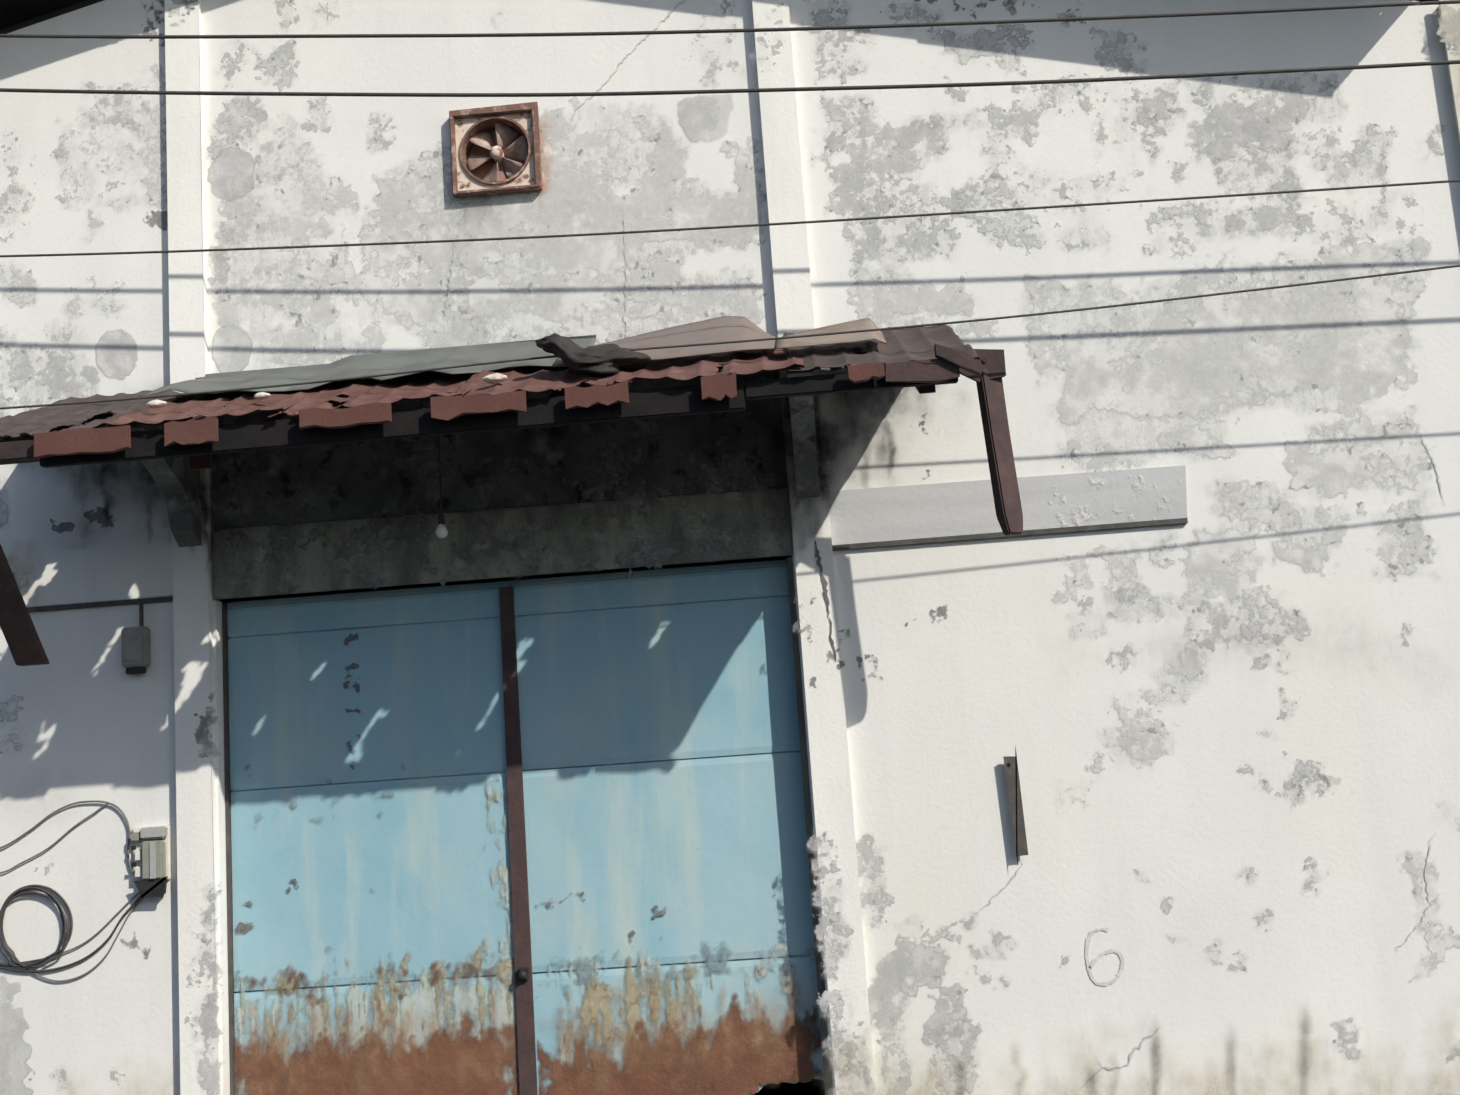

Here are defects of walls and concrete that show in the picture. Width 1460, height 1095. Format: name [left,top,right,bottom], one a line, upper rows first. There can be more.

peeling [221,33,298,92]
peeling [0,132,32,241]
peeling [208,96,766,366]
peeling [0,331,100,410]
peeling [811,0,1434,760]
peeling [50,507,113,533]
crack [815,541,836,662]
peeling [1238,752,1331,796]
peeling [0,978,35,1095]
corrosion [234,777,519,1095]
corrosion [538,930,822,1095]
peeling [807,831,1010,1095]